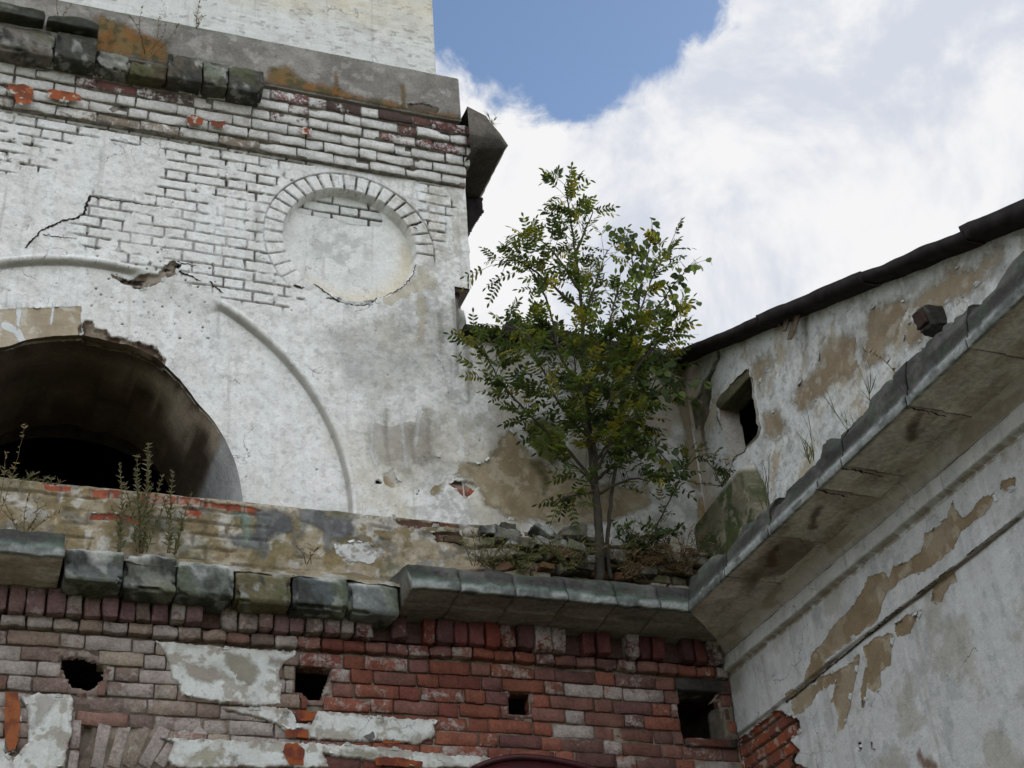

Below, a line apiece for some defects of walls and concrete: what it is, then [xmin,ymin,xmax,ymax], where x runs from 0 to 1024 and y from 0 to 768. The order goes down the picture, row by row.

spalling [6,83,34,105]
spalling [47,89,81,102]
crack [25,195,146,248]
spalling [111,260,223,293]
crack [294,265,416,306]
peeling [0,302,166,371]
flaking render [794,245,1004,410]
flaking render [431,429,677,524]
peeling [334,539,377,564]
flaking render [738,477,1016,768]
flaking render [0,692,74,768]
flaking render [155,640,490,768]